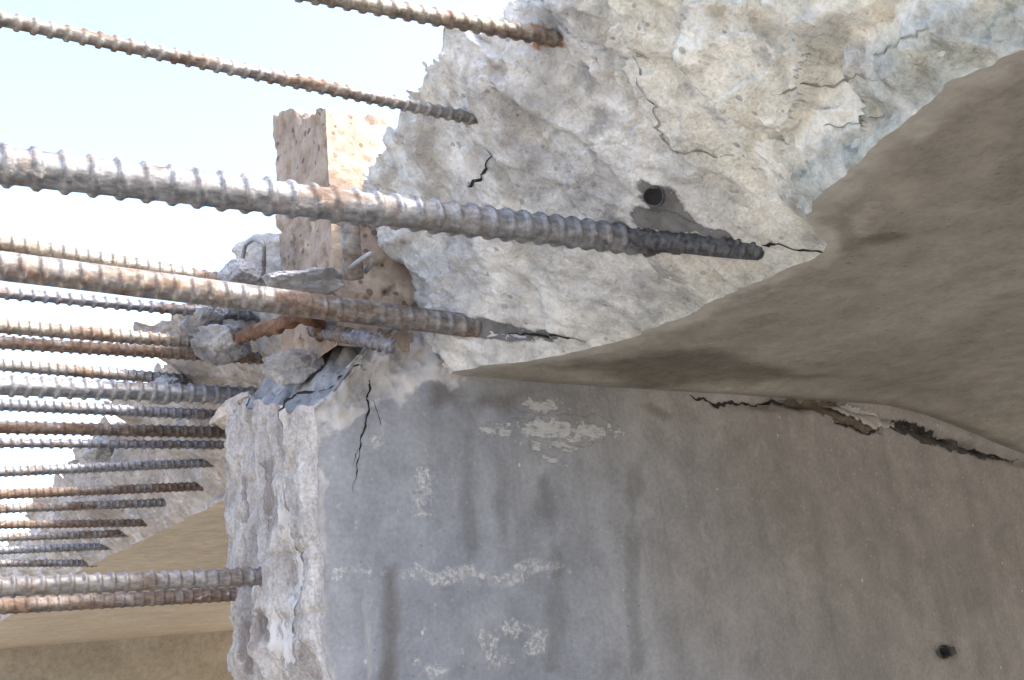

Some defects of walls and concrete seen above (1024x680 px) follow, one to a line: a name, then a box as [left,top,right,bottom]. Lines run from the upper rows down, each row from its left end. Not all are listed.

crack [777,28,927,95]
crack [633,53,732,158]
crack [823,116,881,128]
crack [467,149,492,188]
spalling [0,0,1024,374]
crack [761,243,823,253]
crack [507,332,583,342]
spalling [0,233,482,622]
crack [278,364,381,493]
spalling [238,464,305,677]
damp [403,559,564,587]
damp [479,618,548,664]